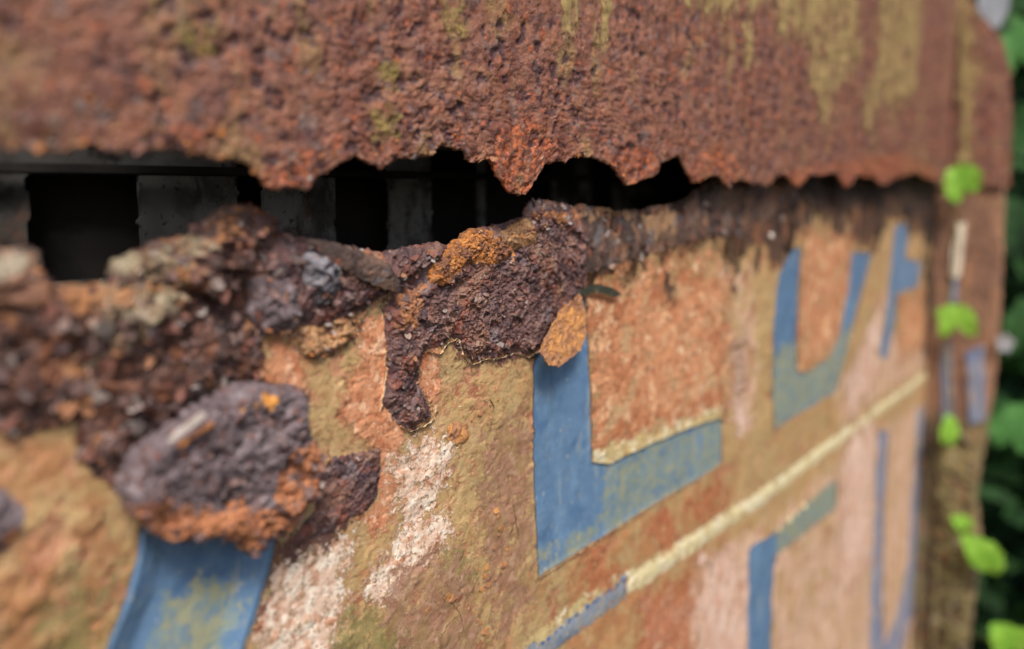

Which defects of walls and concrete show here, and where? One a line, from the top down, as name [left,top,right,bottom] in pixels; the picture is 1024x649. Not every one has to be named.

rust [0,176,798,649]
water stain [578,178,936,300]